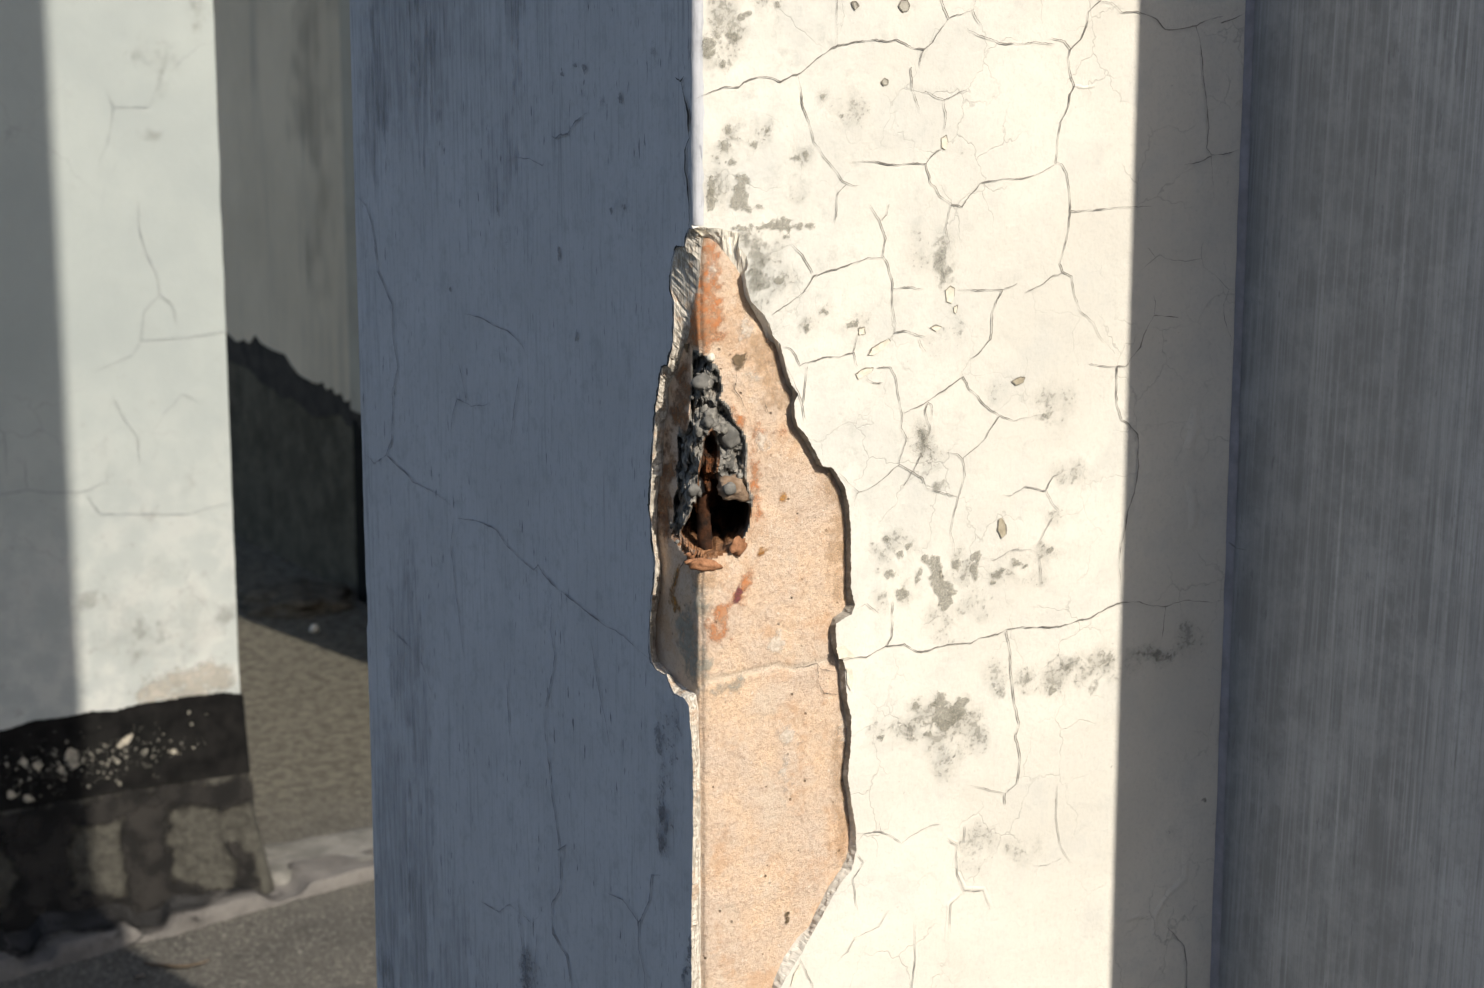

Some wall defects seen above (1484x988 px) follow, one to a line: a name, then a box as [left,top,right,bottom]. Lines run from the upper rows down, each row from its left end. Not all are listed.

leakage [702,11,752,68]
mould [706,125,813,290]
crack [676,0,1247,804]
crack [358,197,653,988]
spalling [647,225,857,988]
mould [883,536,1028,610]
peeling [0,663,232,803]
mould [913,693,969,737]
crack [844,824,988,988]